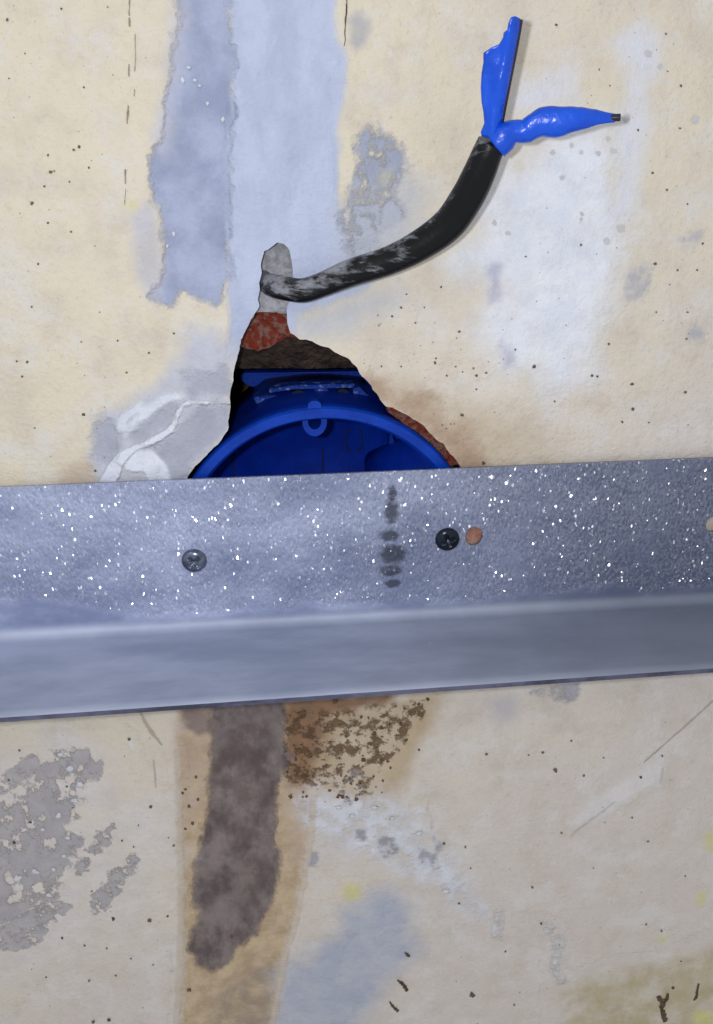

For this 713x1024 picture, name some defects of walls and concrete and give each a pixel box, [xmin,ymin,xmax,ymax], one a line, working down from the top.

peeling [111,0,425,404]
peeling [308,105,453,274]
spalling [385,406,459,467]
spalling [465,527,482,544]
peeling [0,715,214,1006]
leakage [160,702,324,1024]